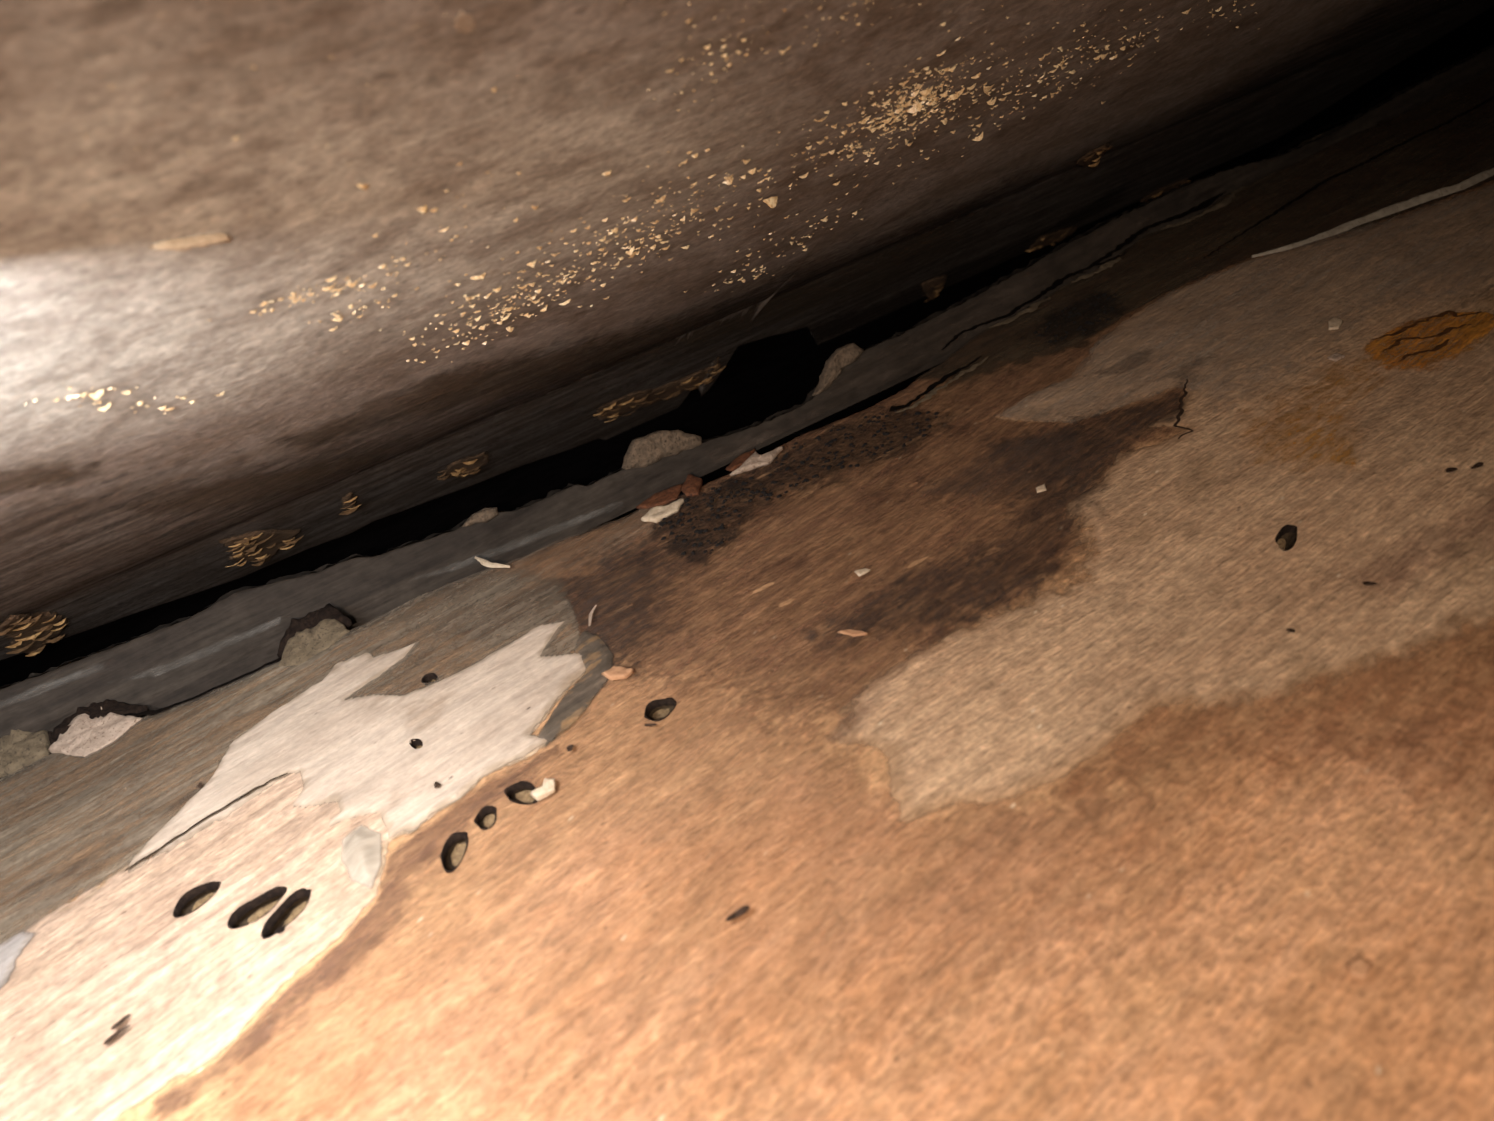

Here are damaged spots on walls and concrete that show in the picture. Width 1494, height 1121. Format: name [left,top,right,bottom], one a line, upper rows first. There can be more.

leakage [0,69,1494,944]
crack [889,50,1494,413]
corrosion [1257,310,1494,464]
peeling [0,621,614,1121]